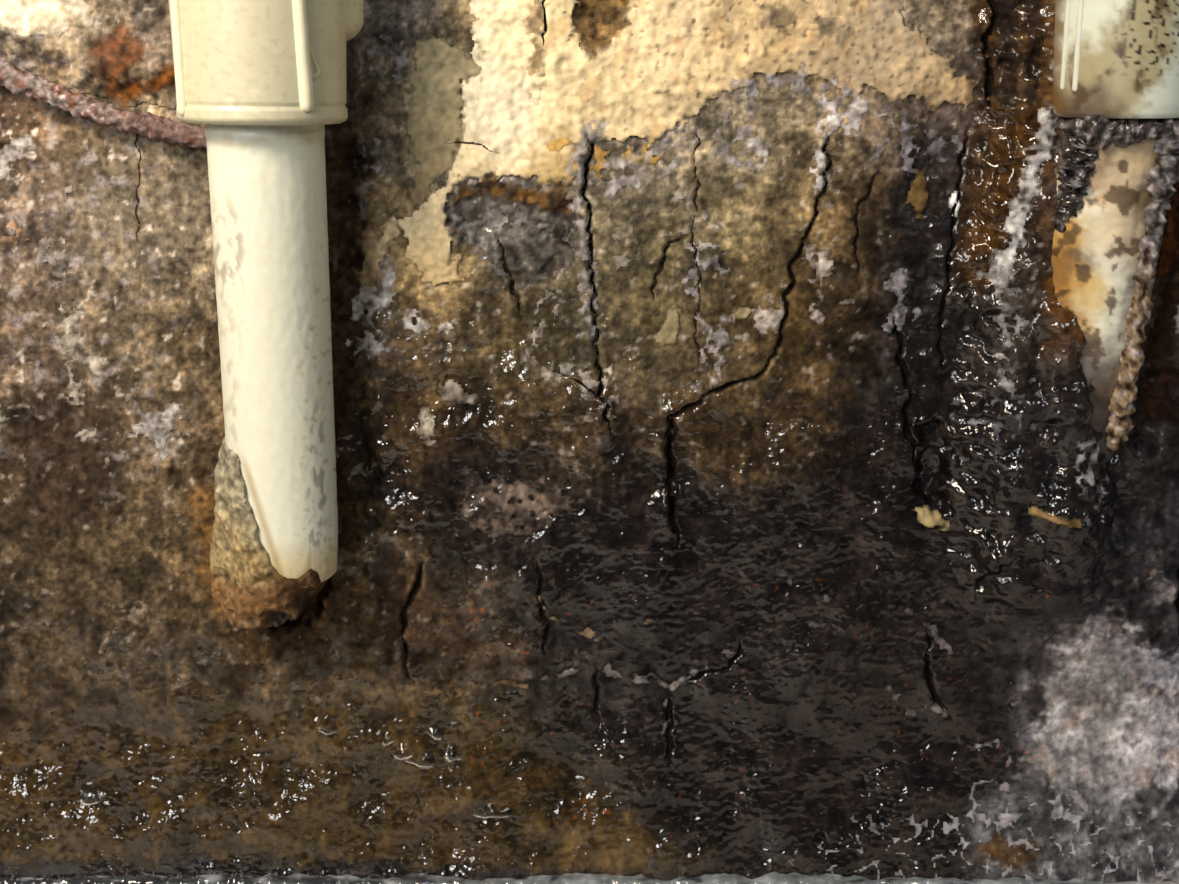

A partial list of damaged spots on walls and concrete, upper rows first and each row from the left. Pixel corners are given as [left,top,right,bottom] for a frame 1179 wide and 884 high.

corrosion [0,27,207,150]
leakage [345,249,396,358]
crack [558,135,611,432]
peeling [354,0,974,292]
flaking render [655,310,680,346]
crack [650,129,701,365]
flaking render [734,307,751,319]
crack [665,140,832,547]
leakage [367,0,1179,883]
corrosion [967,0,1056,284]
corrosion [1137,182,1179,417]
leakage [0,783,563,880]